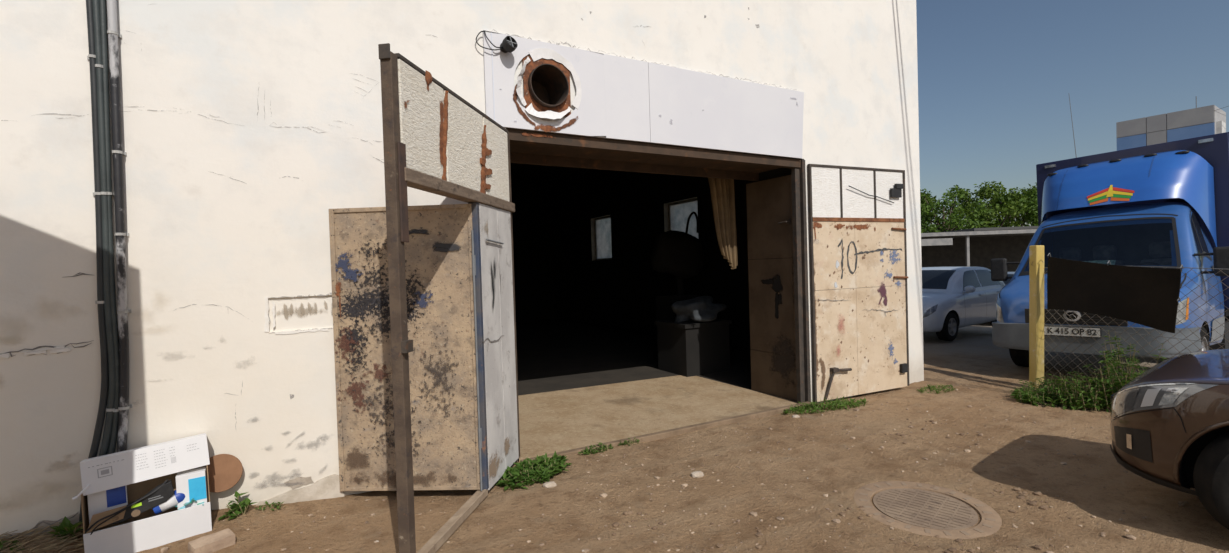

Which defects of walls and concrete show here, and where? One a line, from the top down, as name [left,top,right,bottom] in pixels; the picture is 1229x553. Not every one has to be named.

corrosion [439,90,448,181]
corrosion [480,125,492,194]
corrosion [513,84,578,138]